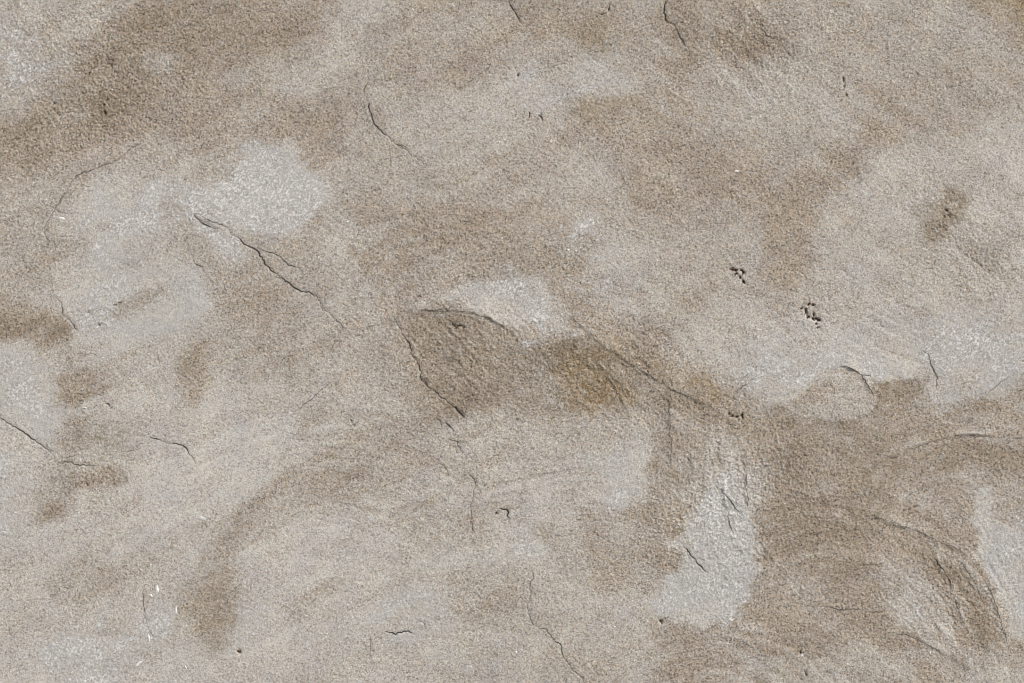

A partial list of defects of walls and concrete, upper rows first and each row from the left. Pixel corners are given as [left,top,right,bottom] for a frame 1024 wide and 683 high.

crack [364,69,426,167]
crack [194,215,491,532]
crack [1,418,95,466]
crack [527,567,584,681]